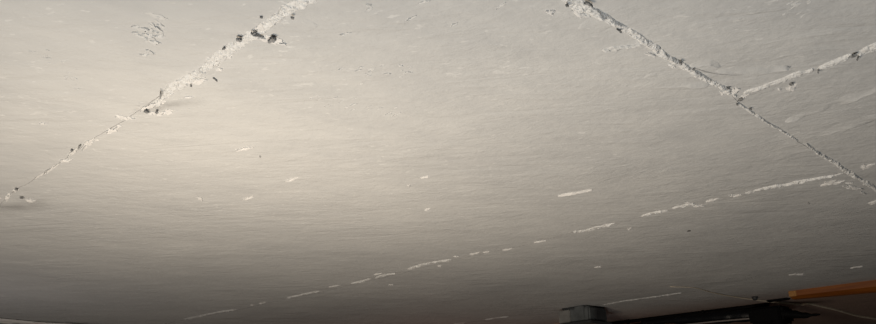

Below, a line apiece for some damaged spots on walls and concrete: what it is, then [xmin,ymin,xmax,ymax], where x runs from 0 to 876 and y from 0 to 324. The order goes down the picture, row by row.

crack [0,0,317,205]
crack [180,0,876,321]